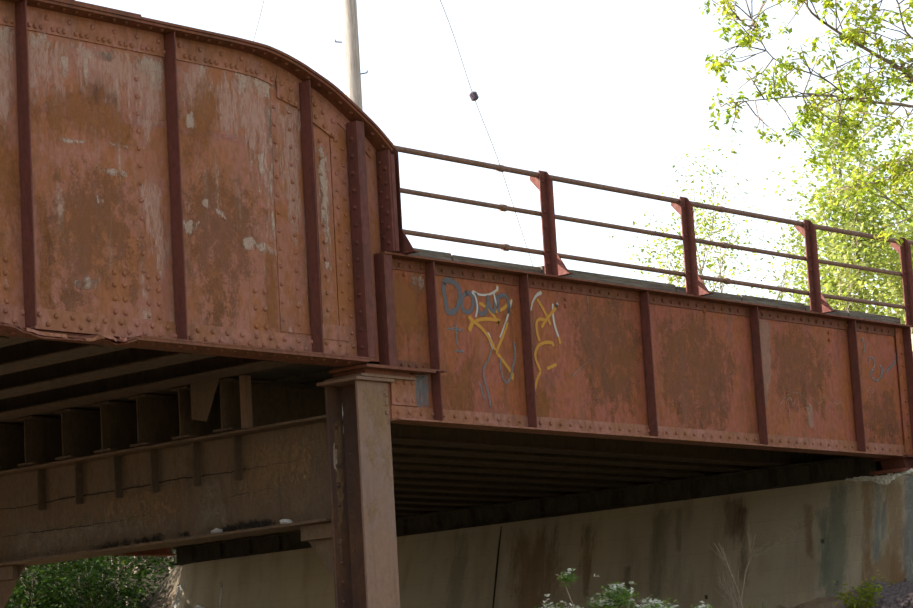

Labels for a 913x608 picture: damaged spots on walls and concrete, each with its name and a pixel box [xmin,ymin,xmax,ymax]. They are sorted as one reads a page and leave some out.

peeling [29,32,162,144]
peeling [141,183,168,277]
peeling [180,65,301,257]
peeling [318,146,330,238]